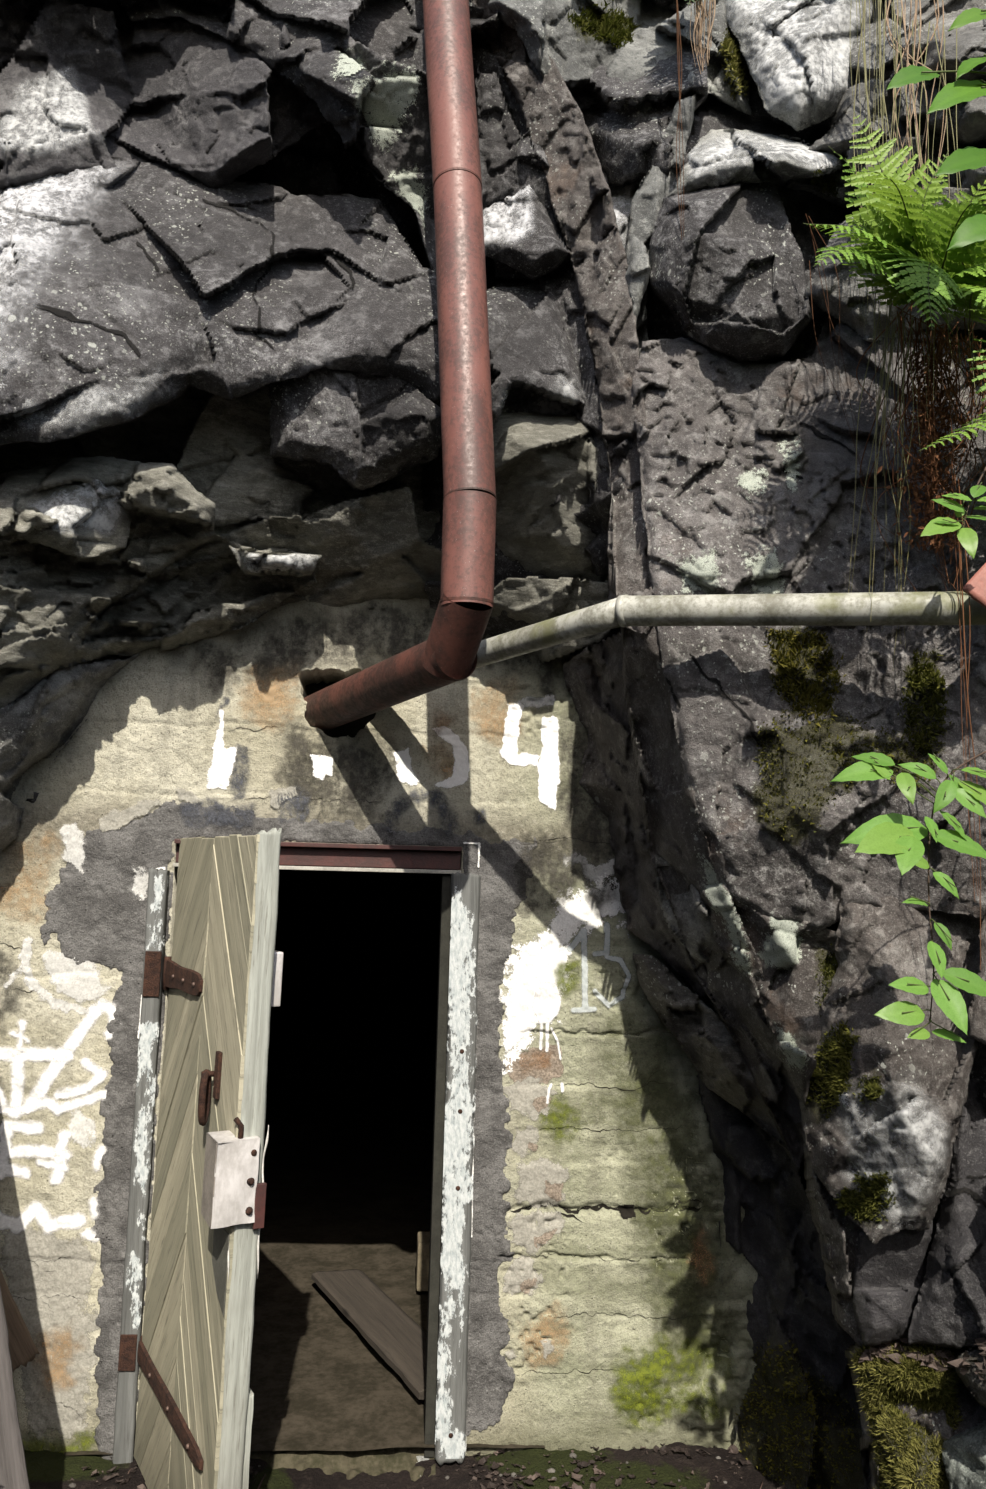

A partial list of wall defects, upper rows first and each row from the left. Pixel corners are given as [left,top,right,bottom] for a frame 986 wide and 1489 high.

water stain [277,728,395,819]
peeling [60,788,202,873]
peeling [132,867,164,950]
peeling [42,950,112,1003]
peeling [499,853,629,1296]
peeling [68,1110,96,1147]
peeling [126,1021,159,1329]
peeling [435,886,478,1459]
crack [511,1199,702,1262]
spalling [541,1338,554,1359]